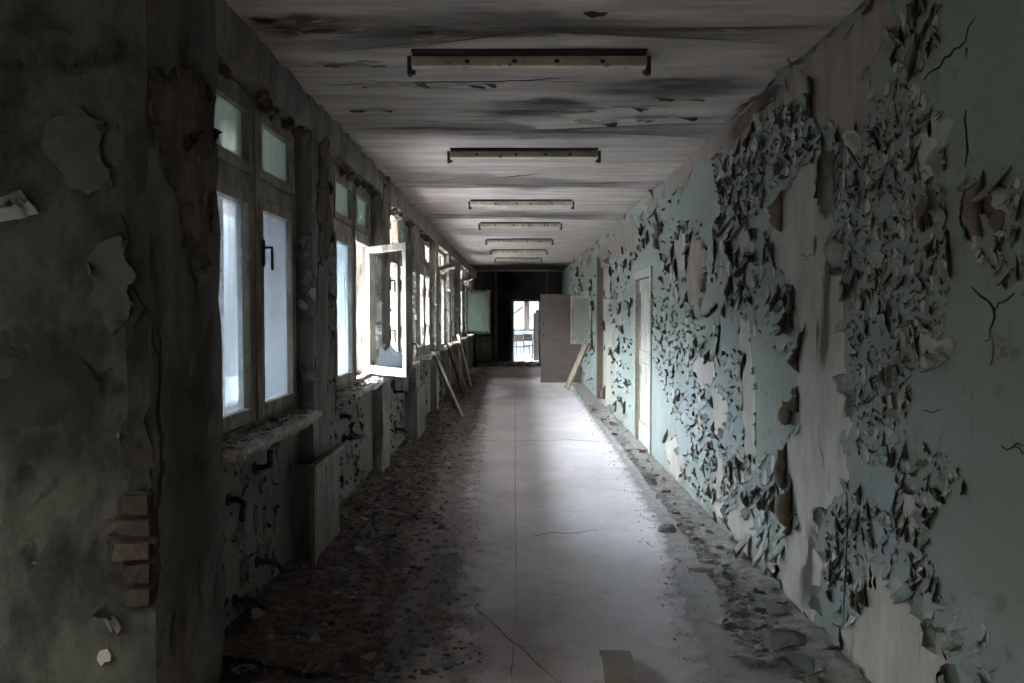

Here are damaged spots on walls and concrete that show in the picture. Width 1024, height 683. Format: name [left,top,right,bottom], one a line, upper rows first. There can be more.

crack [924,18,975,80]
flaking render [0,190,39,222]
flaking render [41,106,114,195]
flaking render [148,61,223,287]
flaking render [87,236,137,333]
peeling [533,0,1024,683]
crack [971,286,1015,337]
flaking render [91,488,162,634]
peeling [223,441,283,627]